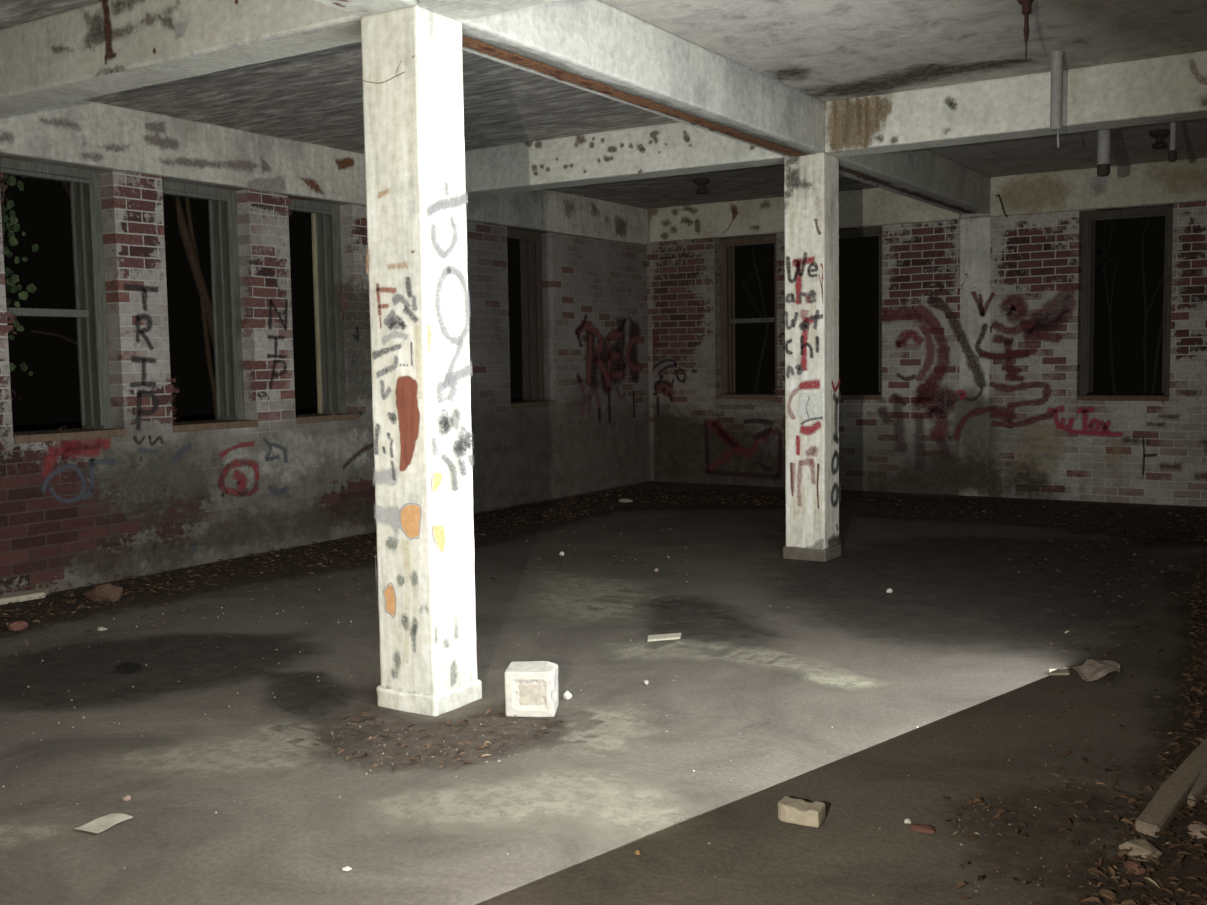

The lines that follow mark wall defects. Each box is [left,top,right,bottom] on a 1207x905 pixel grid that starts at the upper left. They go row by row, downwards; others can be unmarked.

corrosion [99,0,116,64]
peeling [652,205,731,375]
peeling [839,165,976,321]
peeling [994,217,1084,297]